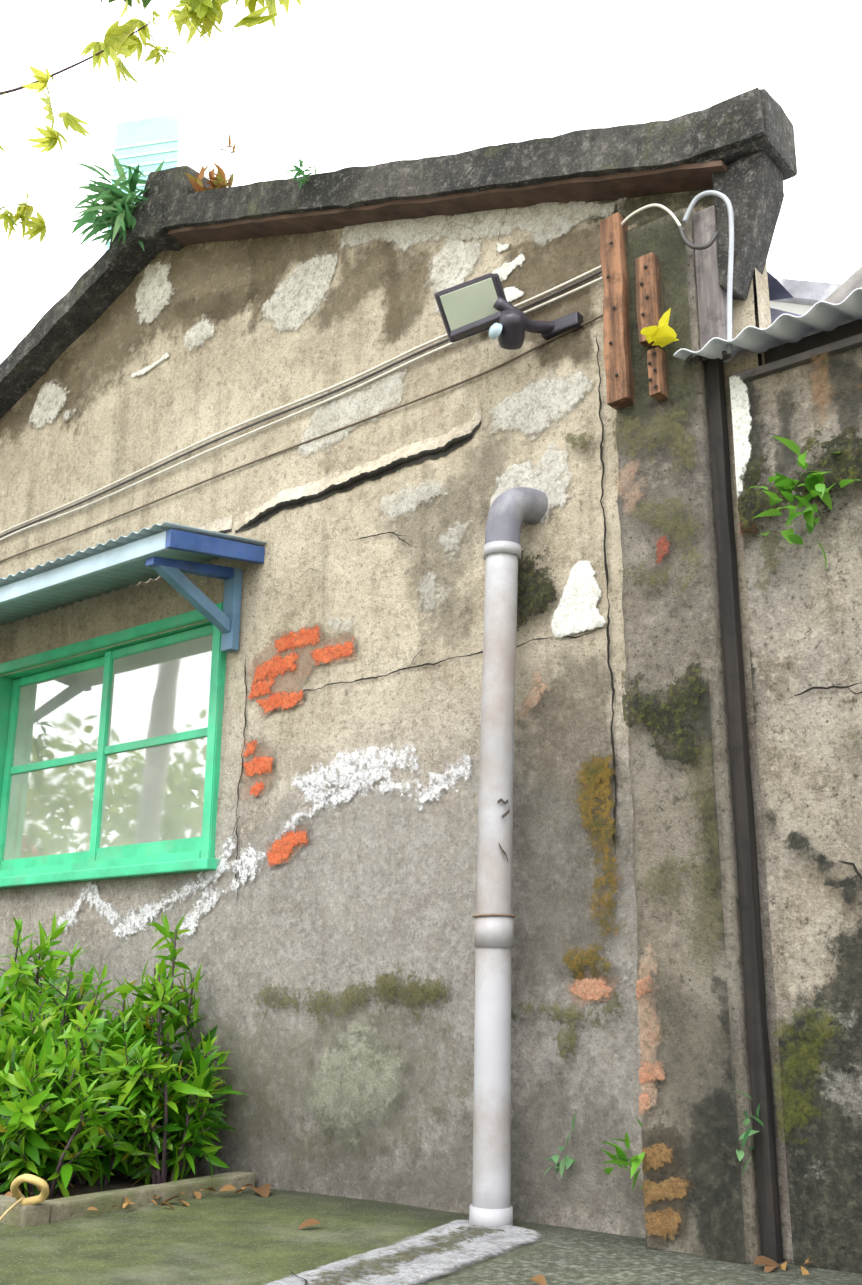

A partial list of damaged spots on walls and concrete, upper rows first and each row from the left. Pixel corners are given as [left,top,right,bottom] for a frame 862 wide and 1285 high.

flaking render [135,259,173,325]
damp [0,231,432,440]
flaking render [261,251,337,333]
flaking render [29,381,76,429]
spalling [214,420,481,533]
crack [350,532,416,548]
crack [516,335,617,850]
crack [303,649,483,692]
crack [794,682,862,696]
damp [4,740,480,1202]
damp [511,781,747,1264]
damp [778,831,862,1274]